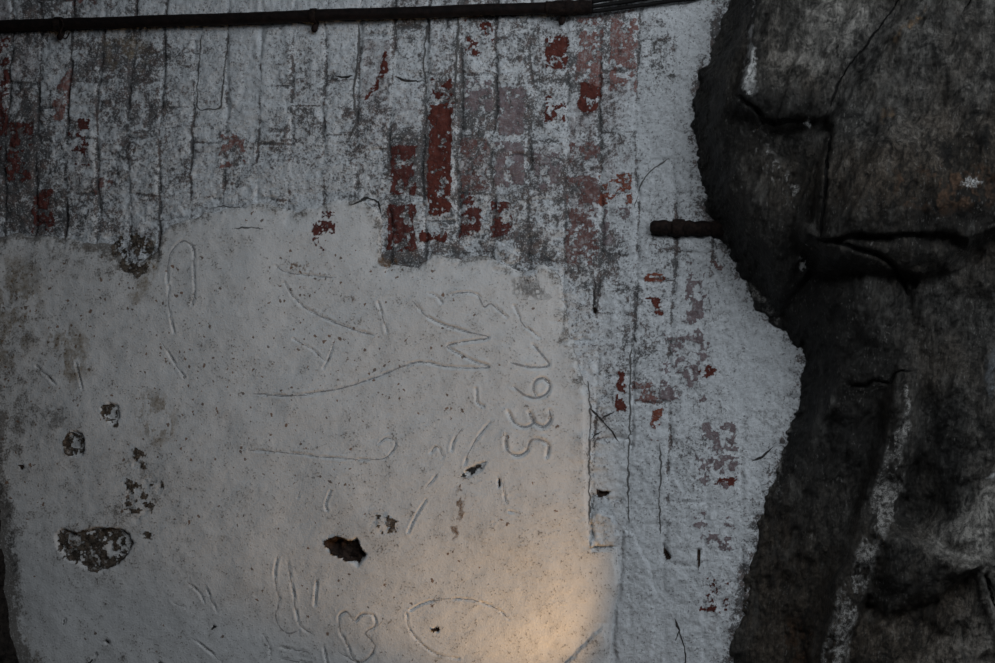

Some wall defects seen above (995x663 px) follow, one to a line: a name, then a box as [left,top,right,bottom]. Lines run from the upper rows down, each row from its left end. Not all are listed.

peeling [463,21,494,56]
peeling [365,51,389,100]
peeling [544,10,639,122]
peeling [386,77,633,266]
flaking render [101,404,119,427]
flaking render [63,431,85,456]
flaking render [132,448,147,469]
flaking render [124,478,164,513]
flaking render [57,527,133,573]
flaking render [324,536,366,563]